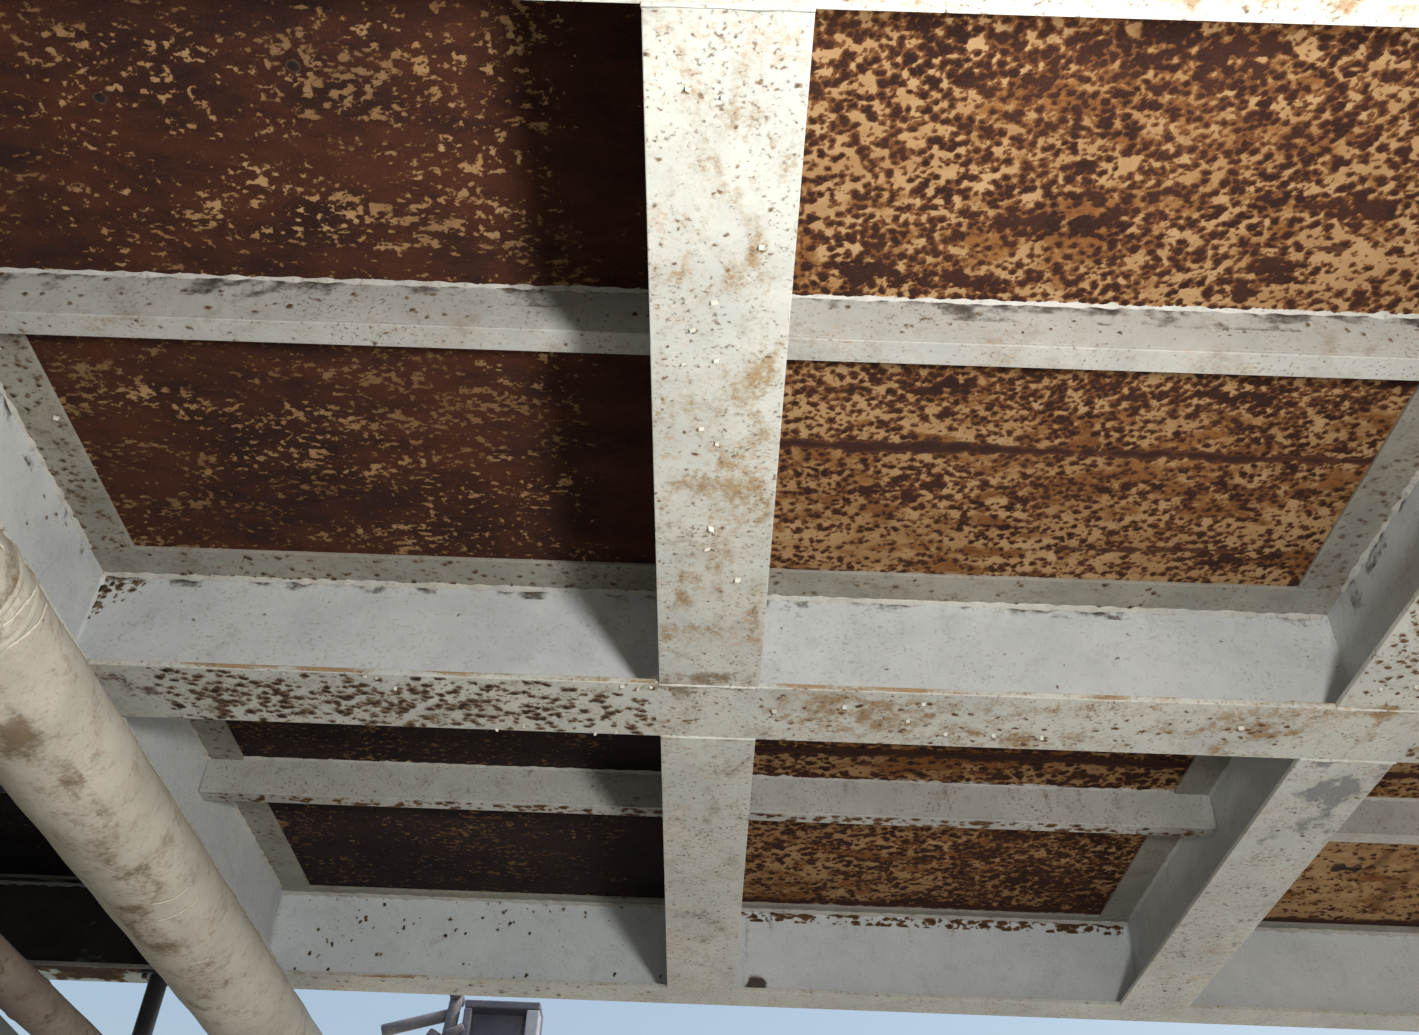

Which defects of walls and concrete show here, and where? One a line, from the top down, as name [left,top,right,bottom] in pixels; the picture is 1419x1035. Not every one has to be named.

rust [0,0,663,319]
rust [769,0,1419,336]
rust [0,303,1419,609]
rust [95,658,741,775]
rust [663,577,742,657]
rust [718,684,1334,797]
rust [1354,744,1419,799]
rust [1363,600,1419,720]
rust [209,793,1204,990]
rust [1195,835,1419,946]